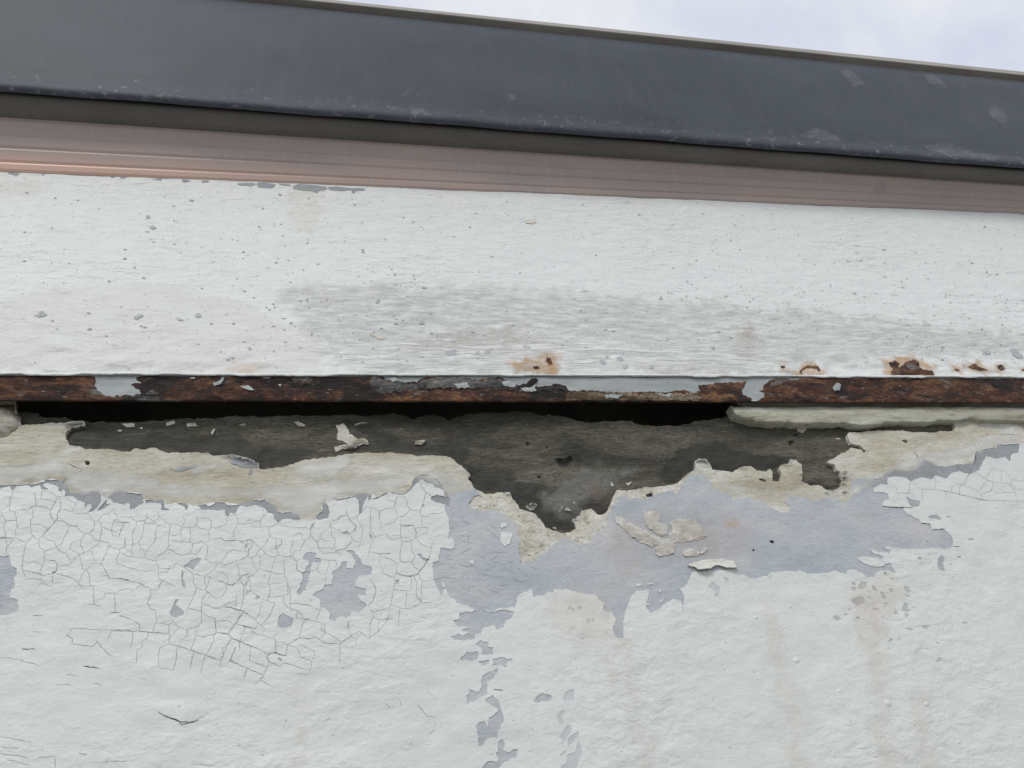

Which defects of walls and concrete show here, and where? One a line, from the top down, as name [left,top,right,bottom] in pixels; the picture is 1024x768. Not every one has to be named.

rust [0,354,1024,402]
damp [70,423,313,466]
damp [348,422,597,529]
damp [663,444,794,483]
crack [885,451,1023,547]
crack [1,463,536,685]
peeling [0,401,1024,768]